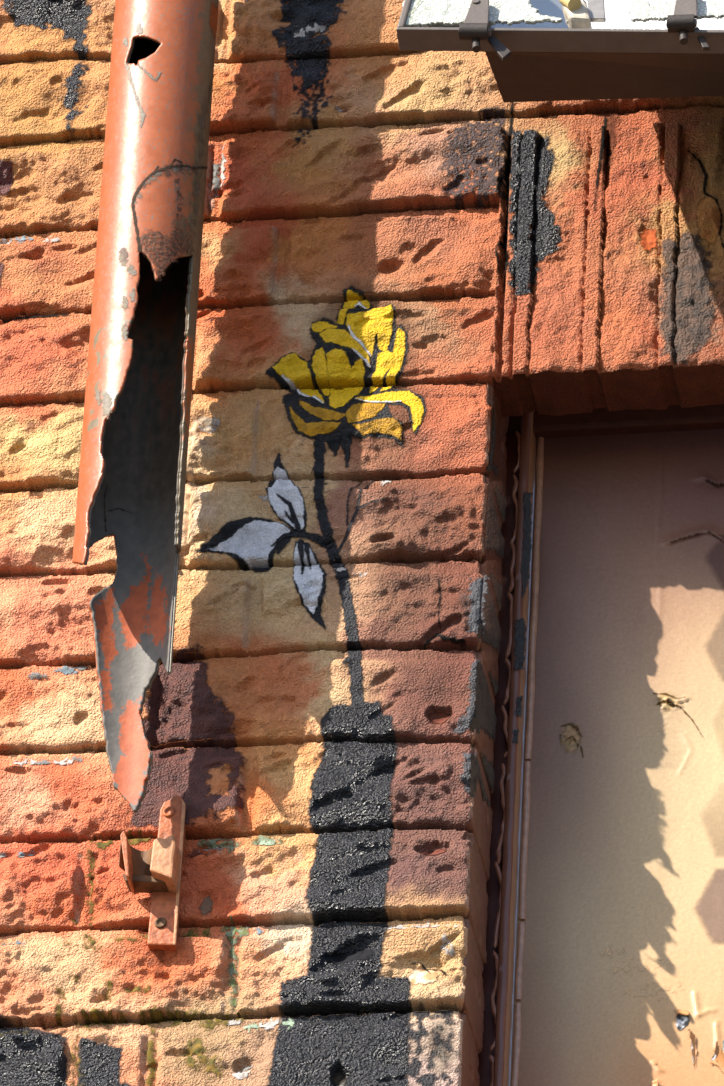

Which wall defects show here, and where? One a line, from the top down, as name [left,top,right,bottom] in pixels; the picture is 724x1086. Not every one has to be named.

crack [705,480,724,488]
crack [671,531,722,543]
peeling [675,1010,697,1066]
peeling [710,1041,724,1073]